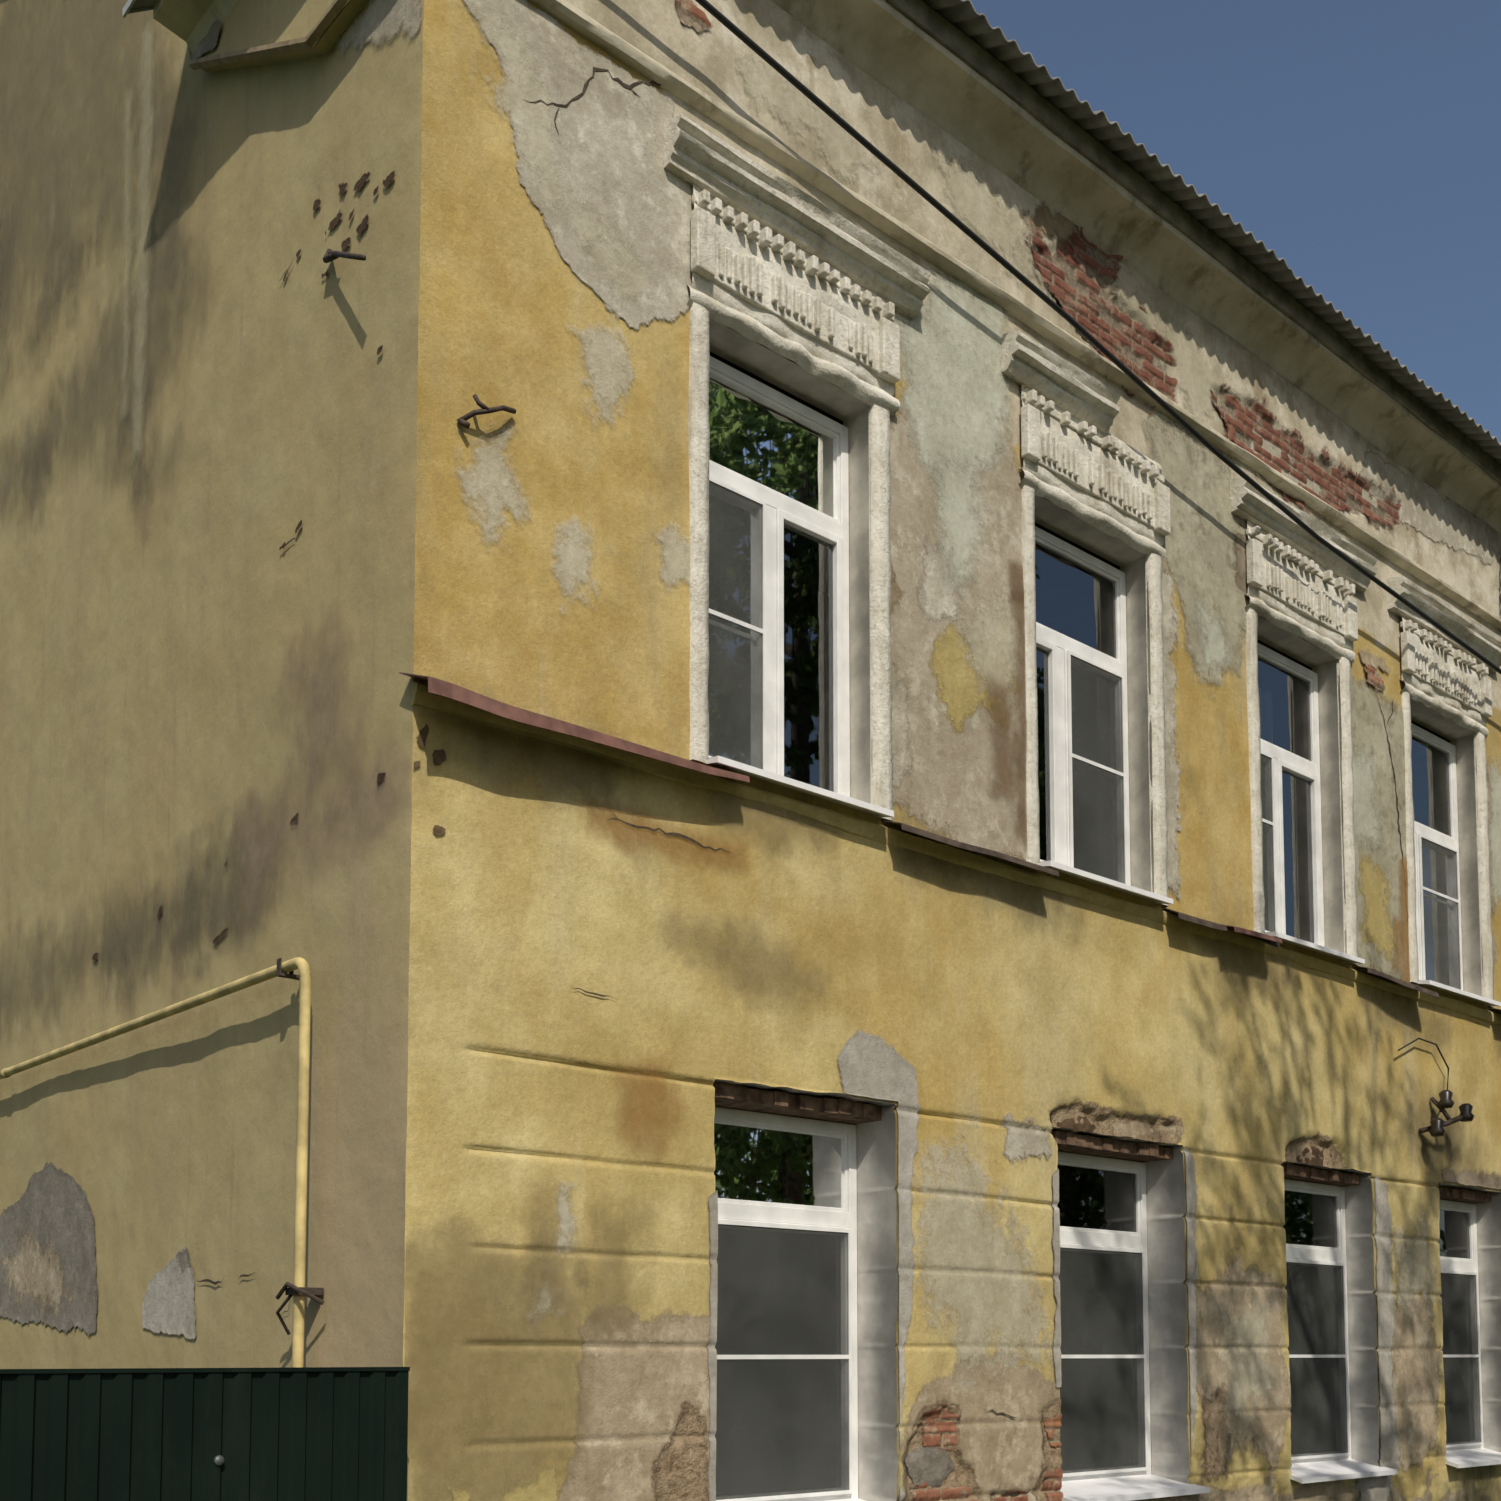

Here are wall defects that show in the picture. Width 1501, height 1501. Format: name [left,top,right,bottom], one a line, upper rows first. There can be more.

leakage [126,32,152,448]
spalling [325,171,395,250]
peeling [464,0,694,421]
crack [525,67,661,133]
peeling [736,52,881,180]
peeling [458,426,531,541]
peeling [890,400,1026,863]
peeling [933,151,1501,899]
peeling [0,1162,98,1336]
peeling [501,1185,718,1501]
peeling [901,1101,1184,1501]
peeling [1161,1248,1292,1501]